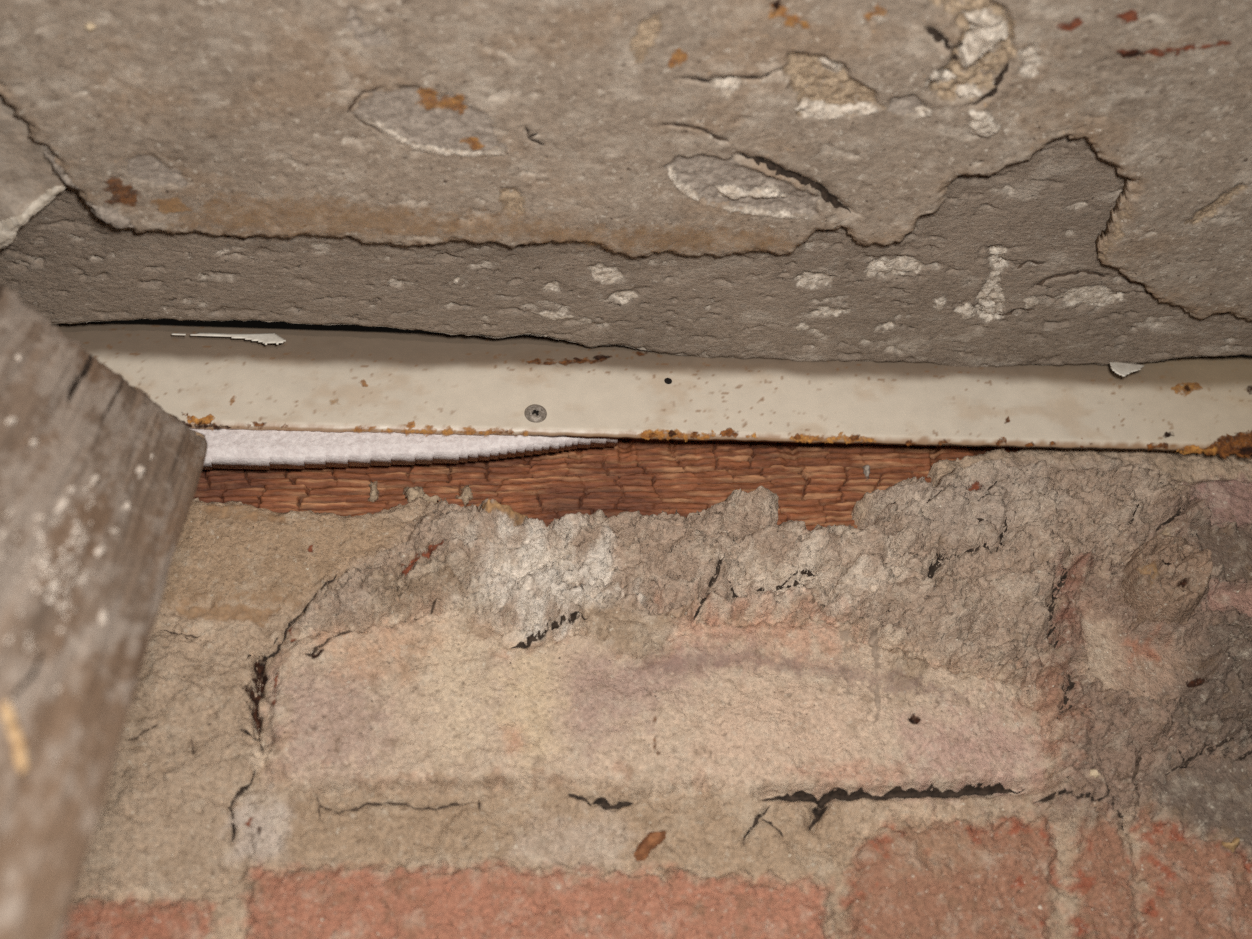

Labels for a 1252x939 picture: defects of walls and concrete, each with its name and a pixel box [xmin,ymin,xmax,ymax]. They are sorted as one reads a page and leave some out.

peeling [0,0,1252,322]
crack [661,123,851,213]
spalling [794,305,851,331]
corrosion [182,413,231,430]
corrosion [354,421,528,436]
corrosion [640,428,756,442]
corrosion [790,432,875,443]
corrosion [1147,430,1252,459]
crack [247,575,364,662]
crack [512,609,588,649]
crack [229,729,263,844]
crack [568,794,633,810]